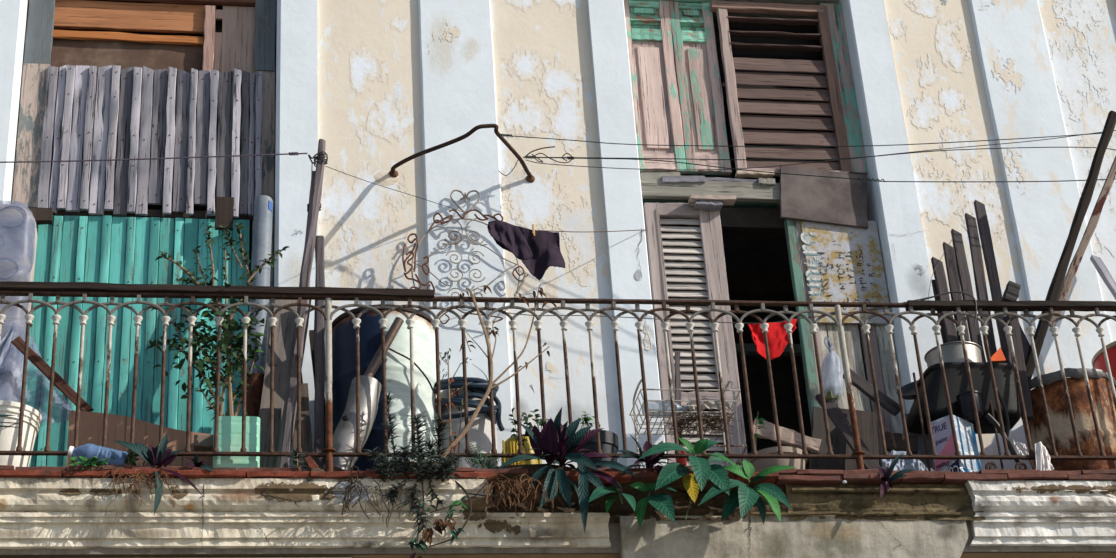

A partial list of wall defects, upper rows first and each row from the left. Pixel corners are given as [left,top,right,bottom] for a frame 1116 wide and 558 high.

peeling [347,41,419,143]
peeling [497,49,604,287]
peeling [905,0,1027,246]
peeling [1047,0,1116,257]
spalling [255,481,372,509]
spalling [462,496,529,535]